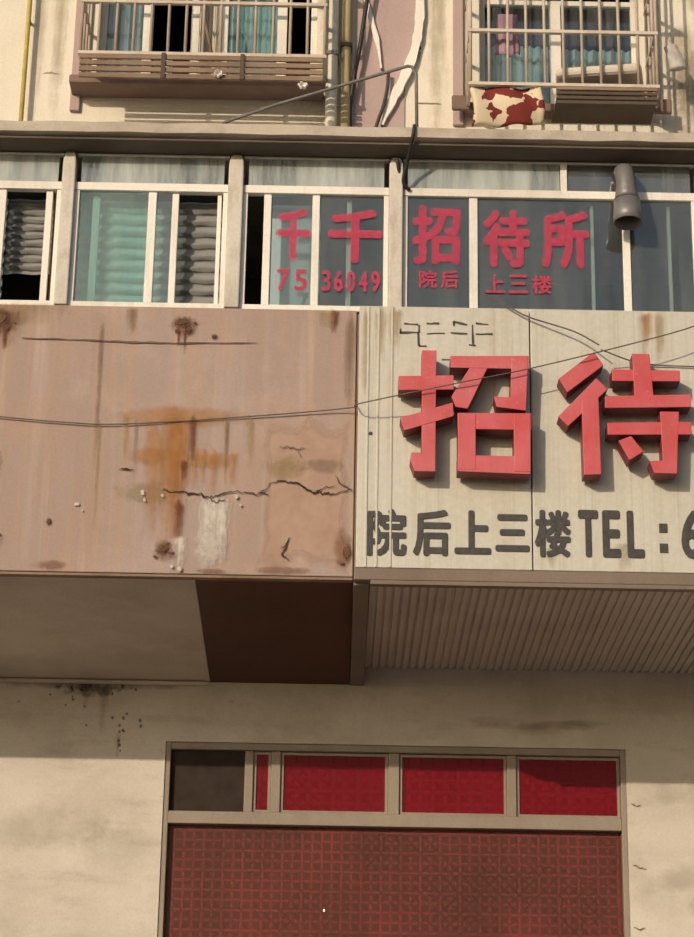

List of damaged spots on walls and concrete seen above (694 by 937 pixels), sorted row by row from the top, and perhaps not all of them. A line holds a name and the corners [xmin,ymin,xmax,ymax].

rust [181,417,195,473]
crack [163,477,352,503]
damp [49,684,113,706]